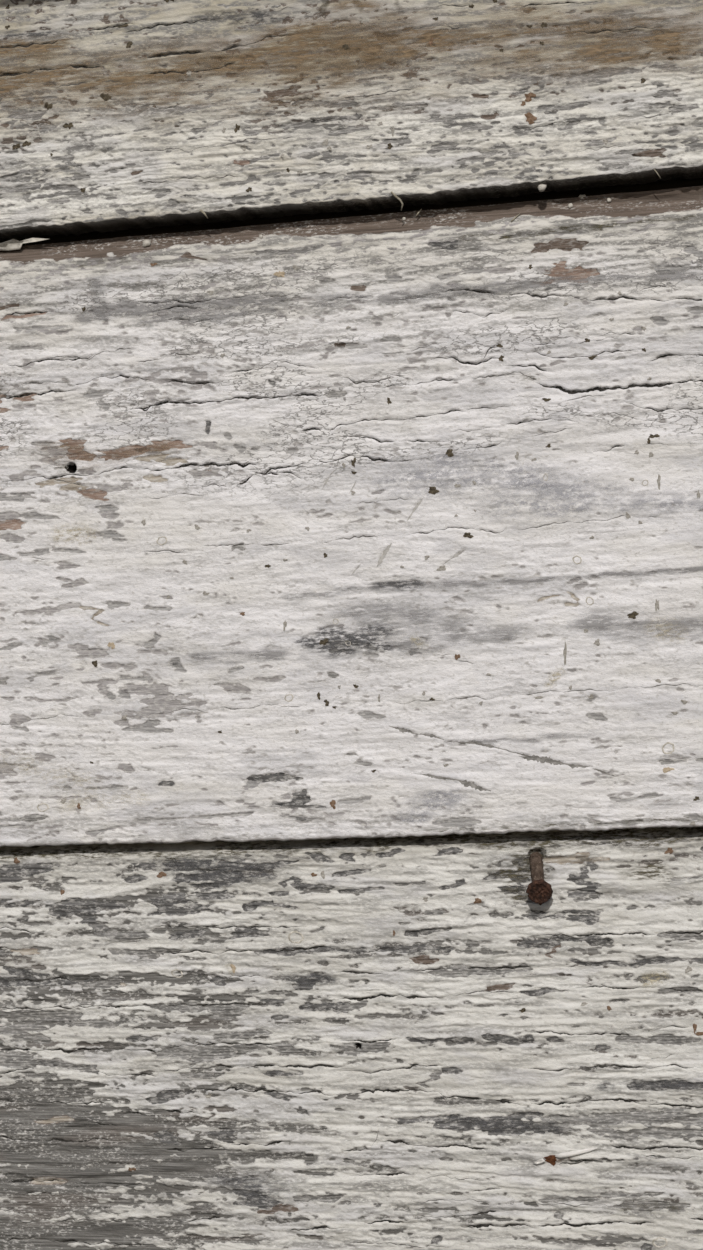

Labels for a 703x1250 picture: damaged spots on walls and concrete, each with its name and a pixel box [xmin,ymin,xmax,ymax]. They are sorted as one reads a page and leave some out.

water stain [0,7,550,107]
water stain [560,18,697,70]
crack [139,268,298,322]
crack [321,285,702,323]
crack [1,332,703,499]
peeling [0,421,260,626]
peeling [0,898,206,959]
peeling [124,847,466,916]
peeling [227,909,564,996]
peeling [483,847,703,968]
peeling [126,972,368,1104]
peeling [393,1107,703,1140]